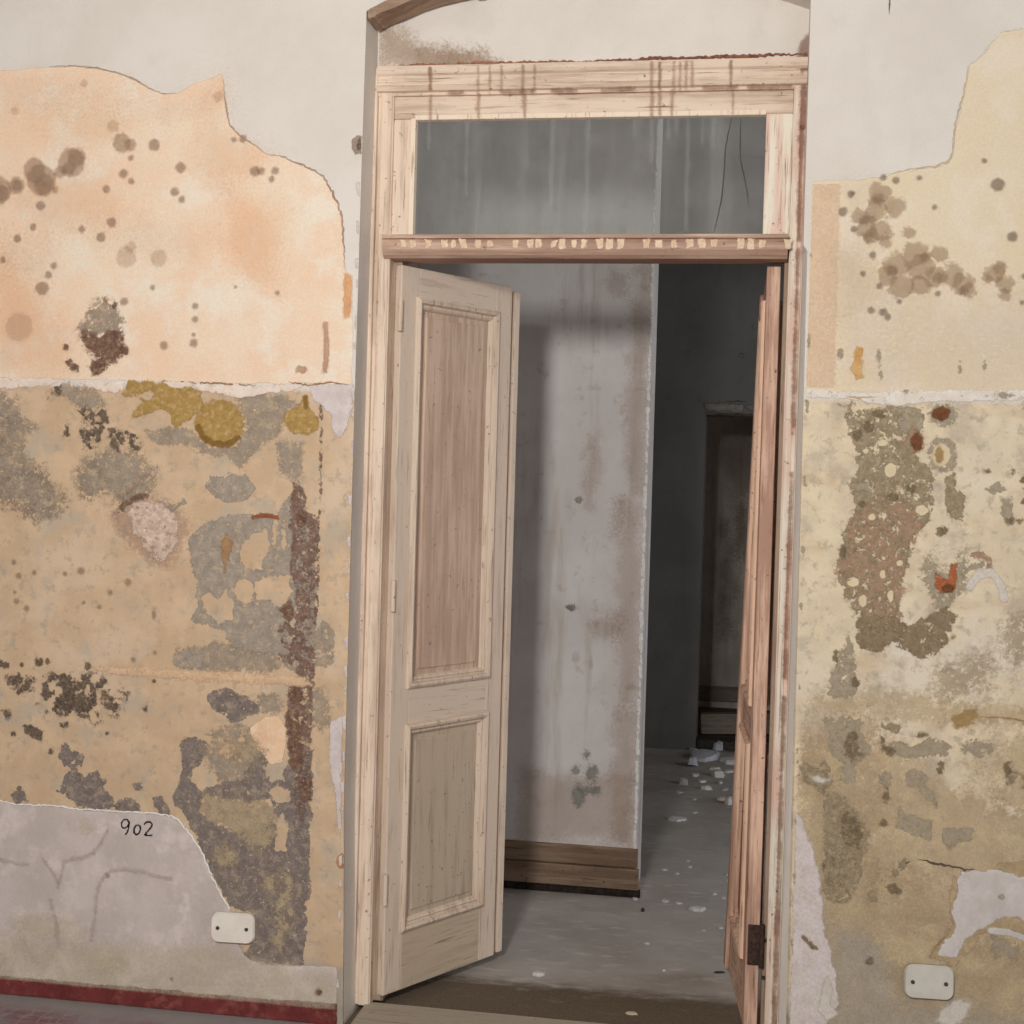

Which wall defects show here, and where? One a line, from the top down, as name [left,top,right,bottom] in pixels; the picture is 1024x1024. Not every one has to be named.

spalling [352,136,362,154]
damp [63,297,129,376]
peeling [0,65,359,676]
peeling [805,27,1024,699]
peeling [11,786,29,804]
peeling [56,743,142,812]
peeling [152,687,314,965]
peeling [328,716,346,838]
peeling [797,716,993,807]
peeling [879,806,974,850]